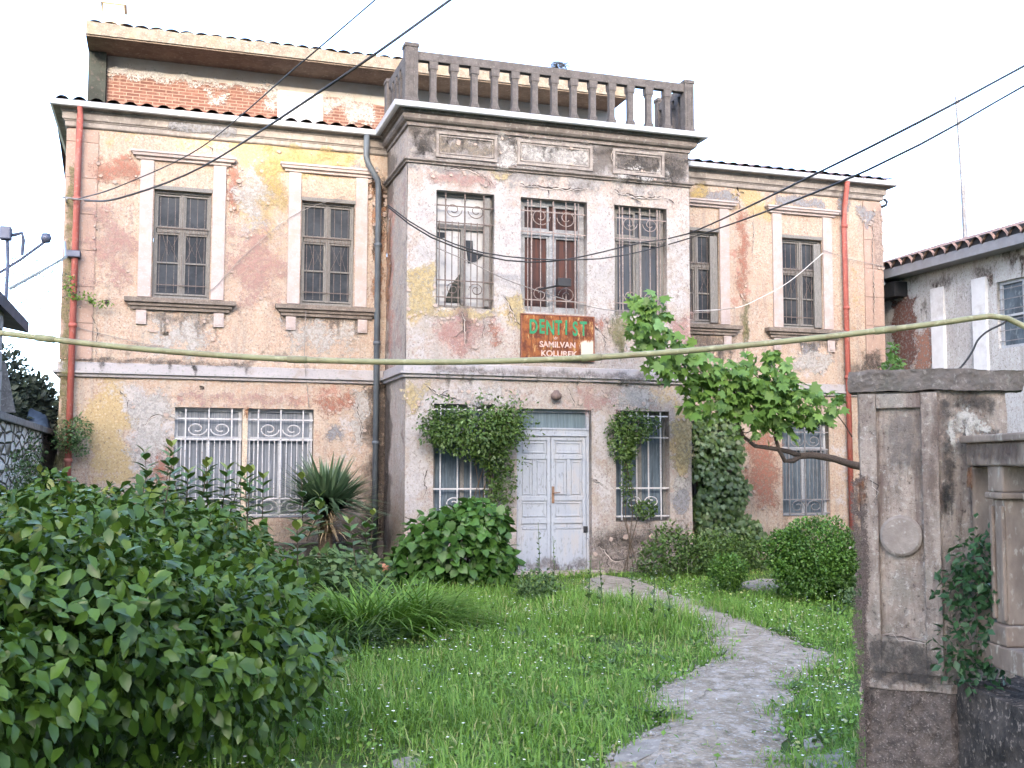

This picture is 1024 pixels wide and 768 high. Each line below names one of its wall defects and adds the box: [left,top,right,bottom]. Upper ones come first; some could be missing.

peeling [106,65,284,112]
peeling [79,152,141,304]
peeling [224,143,391,357]
peeling [406,262,503,358]
spalling [121,381,371,486]
leakage [928,394,1017,515]